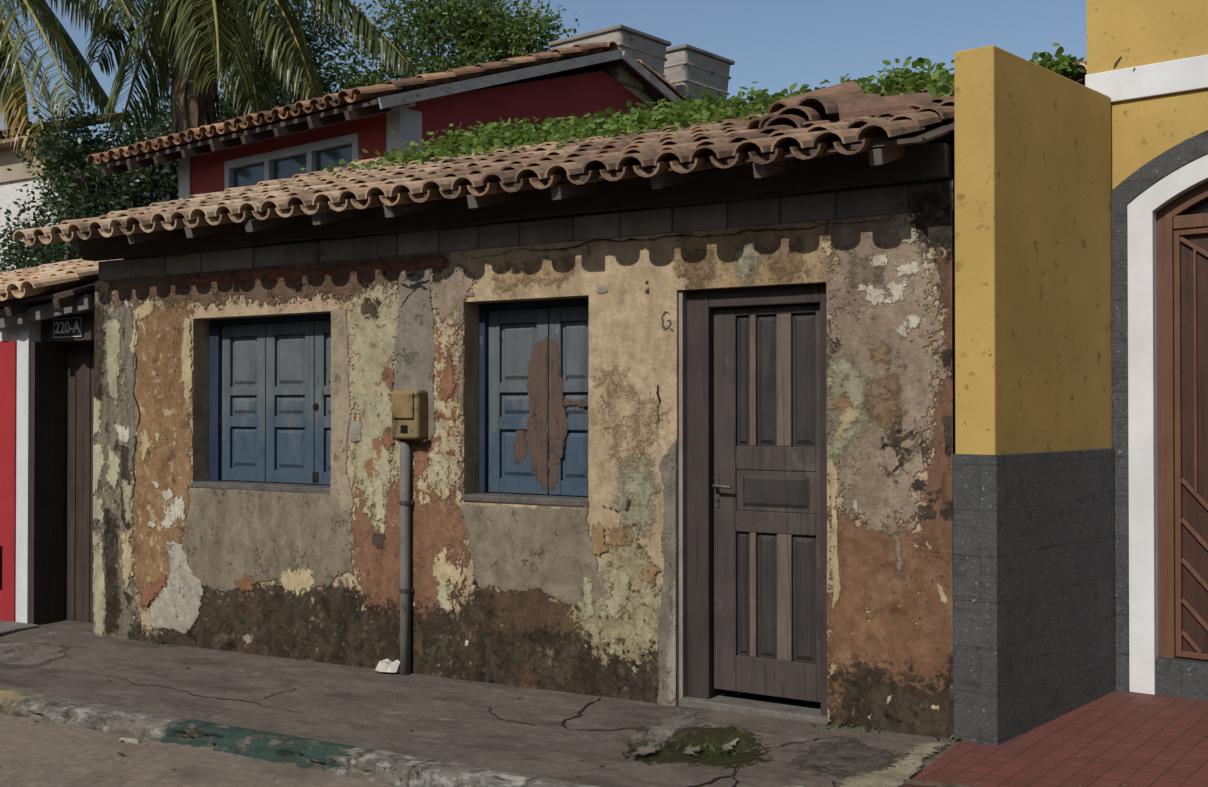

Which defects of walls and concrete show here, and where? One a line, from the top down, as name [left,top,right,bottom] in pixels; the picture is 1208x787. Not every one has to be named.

peeling [104,250,471,627]
damp [93,288,676,704]
crack [376,239,429,308]
peeling [514,338,666,678]
flaking render [818,214,953,559]
damp [881,418,924,483]
damp [827,653,953,739]